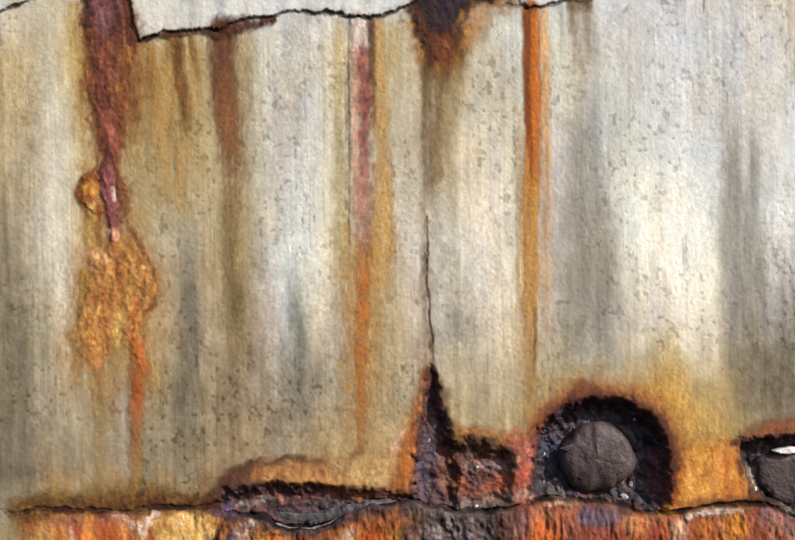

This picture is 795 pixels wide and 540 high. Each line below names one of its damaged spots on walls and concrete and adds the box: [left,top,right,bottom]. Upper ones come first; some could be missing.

crack [204,0,416,33]
crack [503,0,564,9]
crack [139,30,171,42]
rust [407,0,514,190]
rust [517,0,550,369]
rust [9,0,417,540]
spalling [208,368,684,540]
spalling [730,419,795,516]
crack [155,503,214,511]
crack [245,511,333,531]
crack [529,495,641,512]
crack [660,501,795,520]